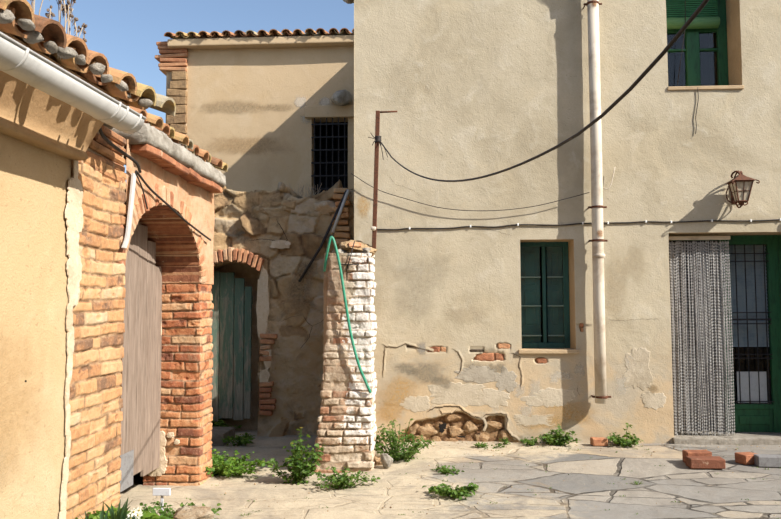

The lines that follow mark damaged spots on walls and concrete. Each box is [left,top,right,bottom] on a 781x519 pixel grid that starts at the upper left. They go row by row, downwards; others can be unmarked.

crack [381,341,465,378]
flaking render [399,343,517,413]
crack [509,351,524,390]
flaking render [513,387,575,427]